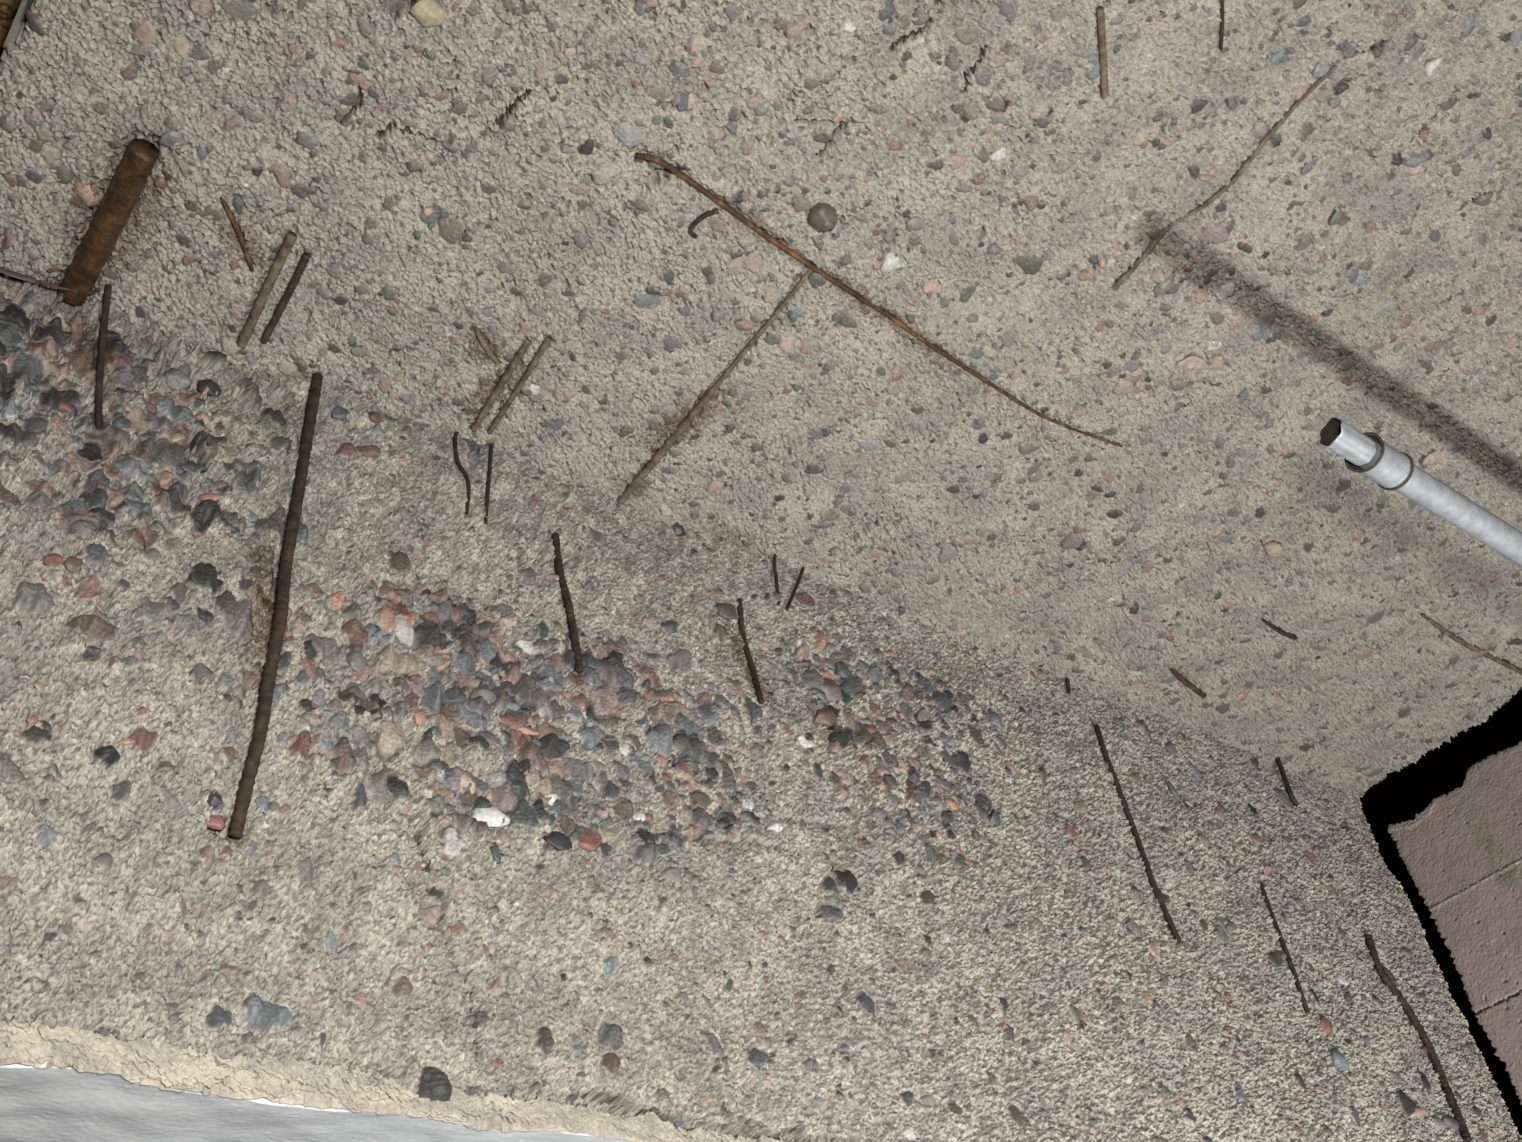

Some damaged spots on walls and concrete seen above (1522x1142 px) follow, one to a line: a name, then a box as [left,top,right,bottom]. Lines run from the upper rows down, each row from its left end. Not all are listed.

spalling [57,138,159,429]
spalling [220,197,311,348]
spalling [616,152,1123,504]
spalling [470,330,552,434]
spalling [180,429,211,478]
spalling [38,646,115,665]
spalling [198,373,323,839]
spalling [482,532,607,673]
spalling [737,599,765,704]
spalling [636,829,814,855]
spalling [762,815,866,832]